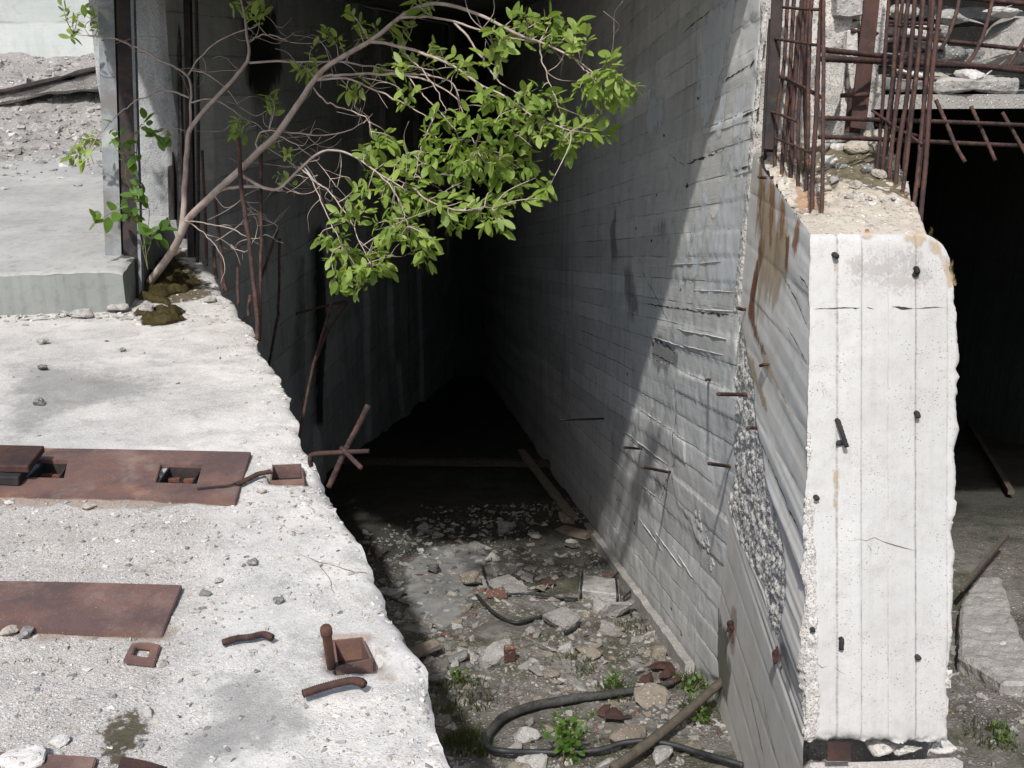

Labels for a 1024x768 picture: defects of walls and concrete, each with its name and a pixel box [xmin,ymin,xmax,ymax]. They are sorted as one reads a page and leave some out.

spalling [728,0,786,635]
corrosion [748,164,827,411]
spalling [804,491,821,740]